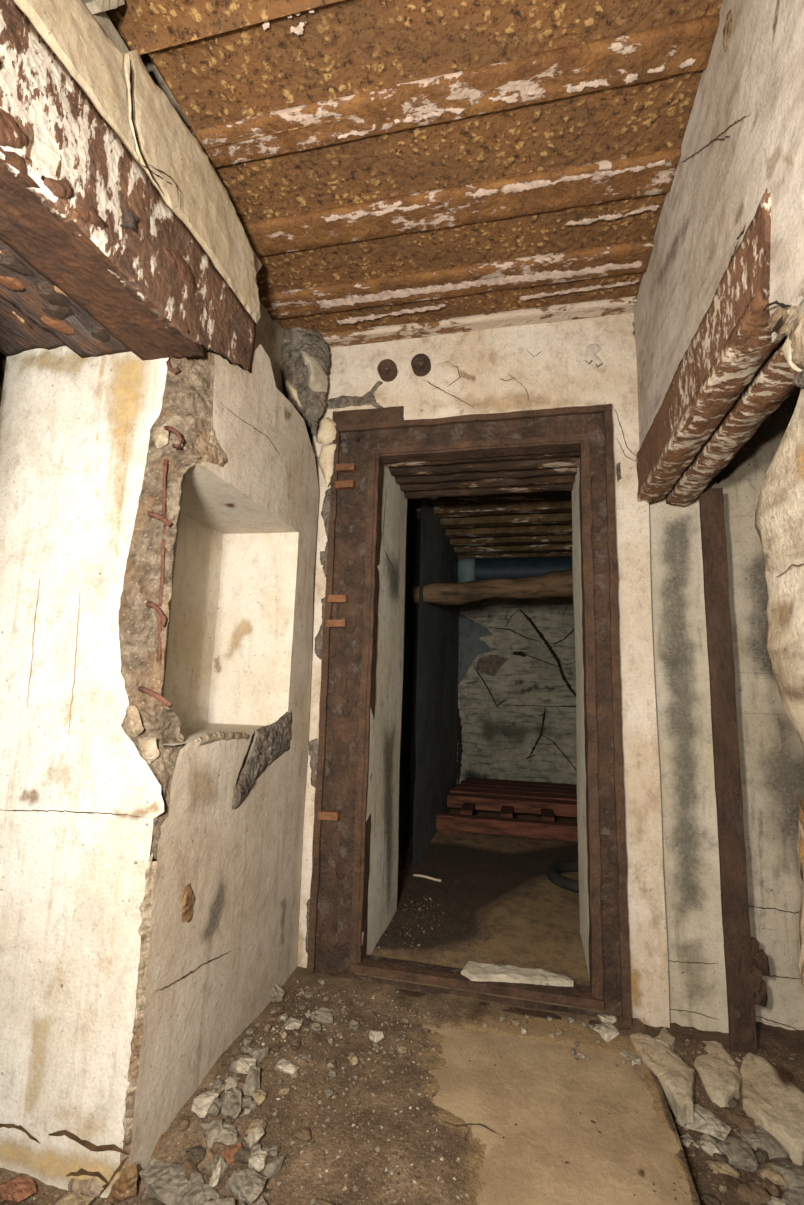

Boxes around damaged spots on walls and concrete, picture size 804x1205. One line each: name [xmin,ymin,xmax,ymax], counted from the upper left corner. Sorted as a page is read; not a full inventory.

peeling [563,78,609,93]
peeling [12,0,261,323]
peeling [321,204,431,222]
peeling [465,159,672,199]
peeling [564,205,659,226]
crack [681,115,748,163]
peeling [316,261,643,324]
spalling [280,327,384,441]
crack [457,609,577,784]
leakage [664,521,699,913]
spalling [107,352,292,1203]
crack [0,1123,128,1199]